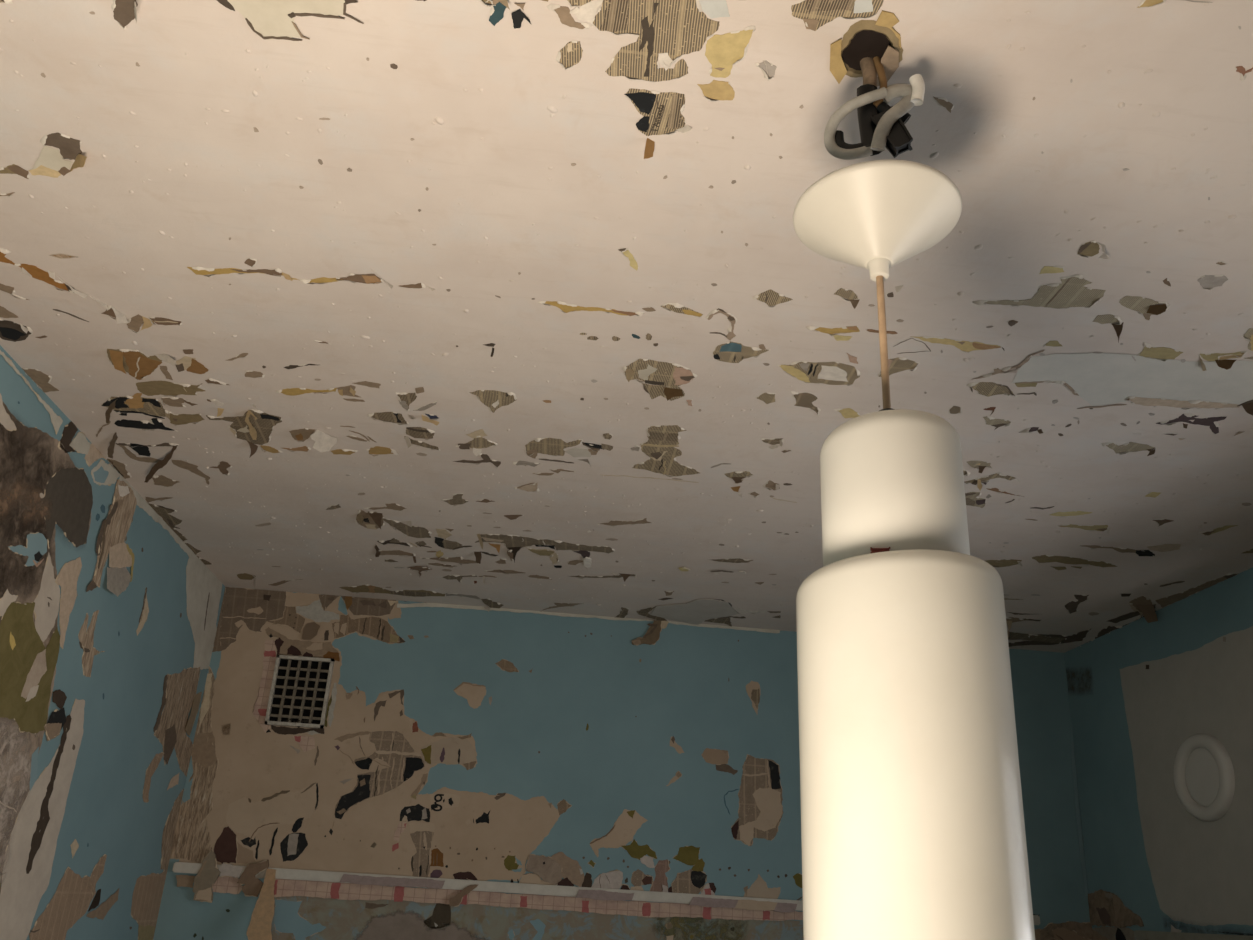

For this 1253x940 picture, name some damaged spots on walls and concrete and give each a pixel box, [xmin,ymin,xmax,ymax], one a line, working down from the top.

flaking render [227,0,345,40]
peeling [556,40,583,70]
peeling [568,0,756,159]
peeling [0,248,109,310]
peeling [1197,261,1229,290]
peeling [226,353,266,378]
peeling [910,336,1004,353]
flaking render [966,266,1253,440]
damp [0,423,62,592]
peeling [0,381,636,940]
peeling [702,748,784,846]
flaking render [271,896,804,940]